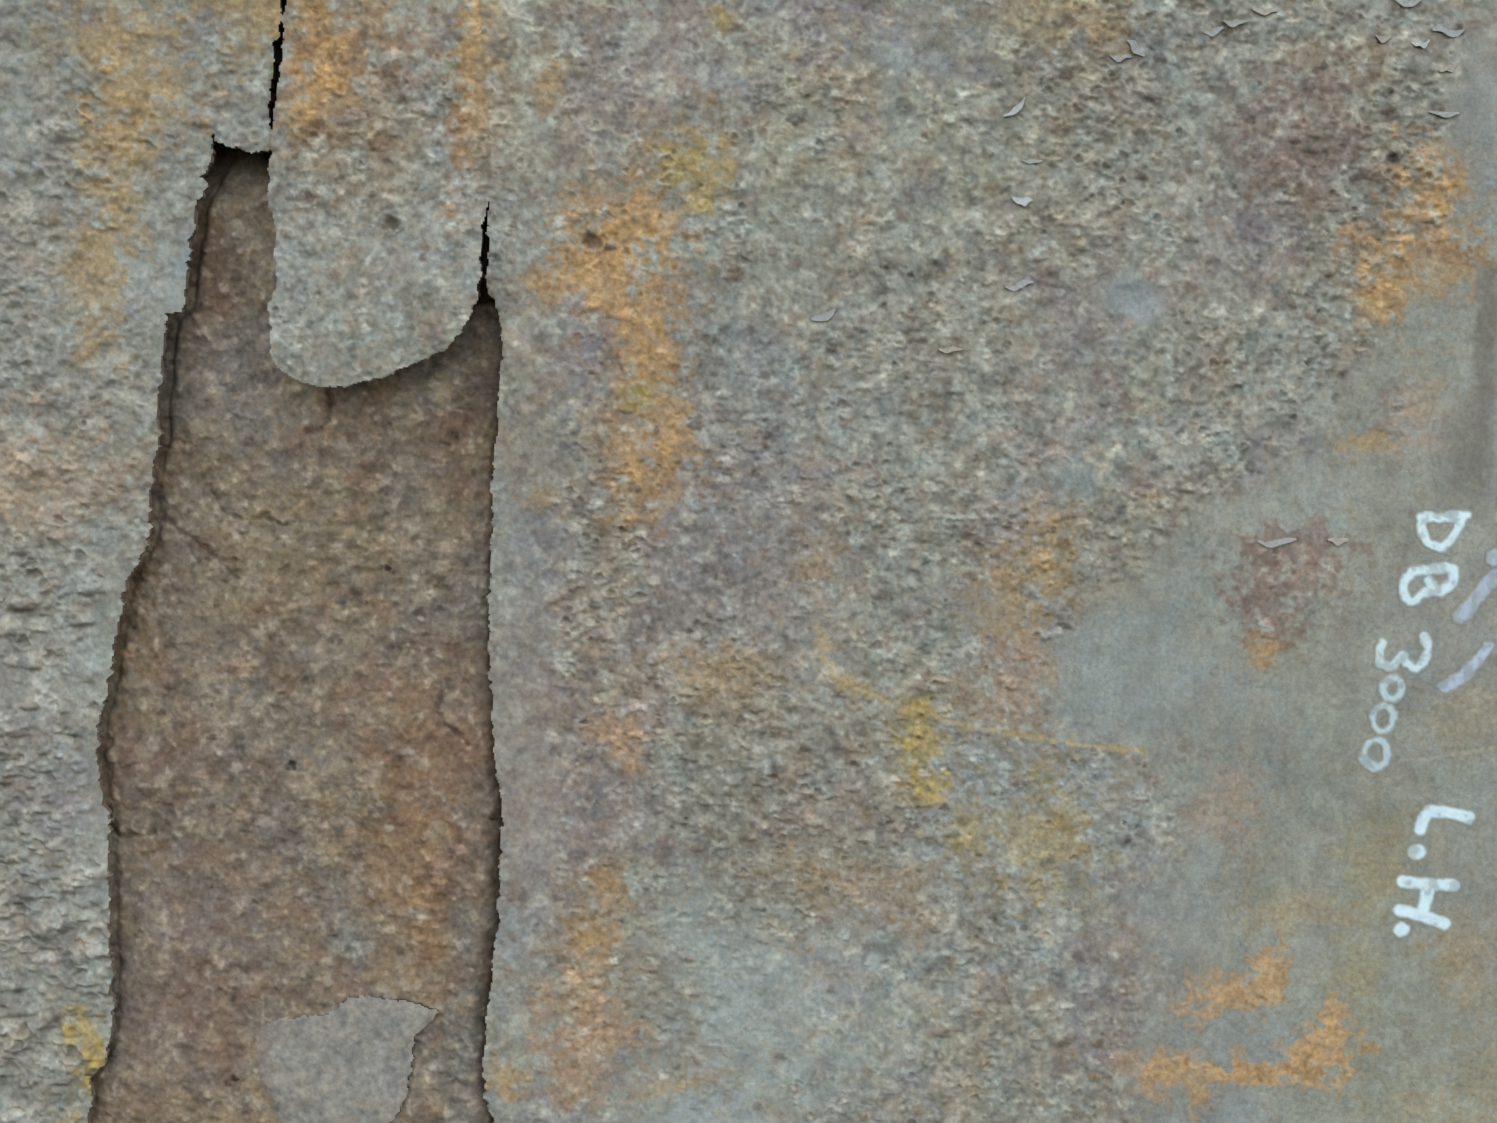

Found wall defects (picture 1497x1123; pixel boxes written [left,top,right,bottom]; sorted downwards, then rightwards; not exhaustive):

crack [268,0,287,130]
rust [414,0,758,562]
rust [1194,8,1497,354]
spalling [87,0,504,1123]
rust [709,464,1149,974]
rust [1060,653,1497,1123]
rust [1176,487,1426,688]